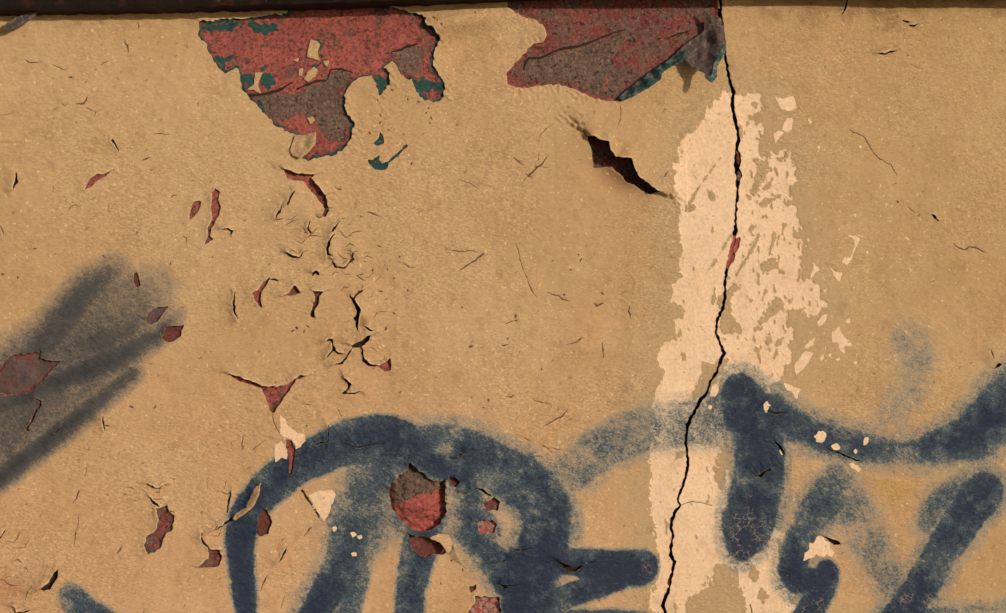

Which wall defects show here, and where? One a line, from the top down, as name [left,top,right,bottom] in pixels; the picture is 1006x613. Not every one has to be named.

peeling [506,0,727,102]
crack [717,0,725,25]
peeling [198,7,445,217]
crack [514,124,553,180]
crack [516,245,568,301]
peeling [582,90,868,399]
crack [661,50,742,613]
crack [755,440,784,477]
crack [829,449,861,461]
flaking render [388,462,460,557]
peeling [649,449,718,613]
peeling [803,536,840,561]